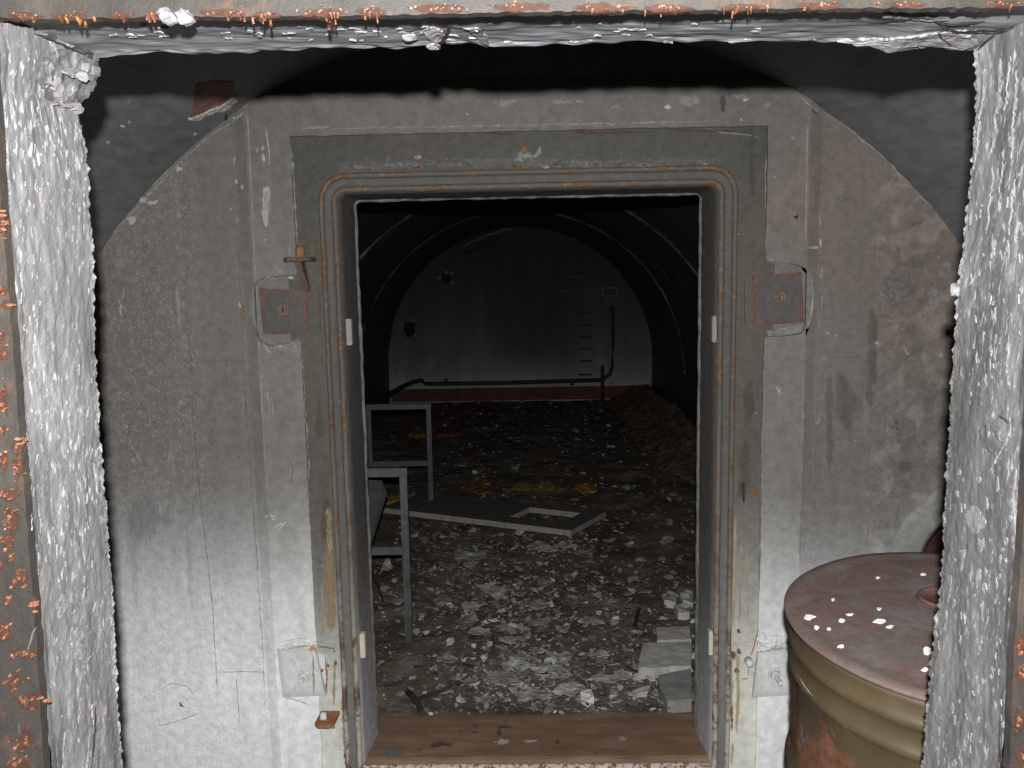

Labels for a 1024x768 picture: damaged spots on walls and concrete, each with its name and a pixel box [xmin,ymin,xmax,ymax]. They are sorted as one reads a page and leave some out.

peeling [109,12,172,38]
spalling [206,5,489,50]
peeling [568,5,673,44]
spalling [837,30,978,53]
spalling [39,49,101,115]
peeling [188,79,298,520]
corrosion [732,520,749,633]
corrosion [730,631,759,731]